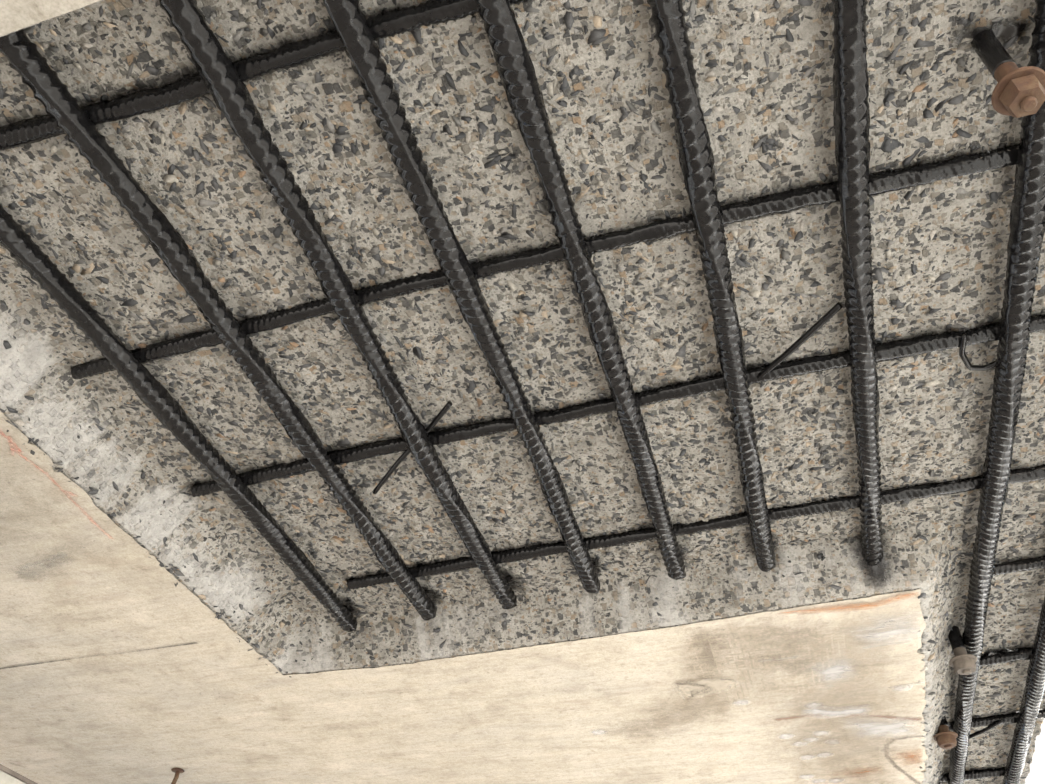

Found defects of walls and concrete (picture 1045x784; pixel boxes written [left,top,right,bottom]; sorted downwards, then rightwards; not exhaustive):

spalling [0,0,196,106]
spalling [0,134,211,350]
spalling [96,95,327,321]
spalling [243,51,441,289]
spalling [375,13,559,264]
spalling [511,0,692,238]
spalling [682,0,838,206]
spalling [724,202,849,367]
spalling [869,165,1016,343]
spalling [866,0,1036,173]
spalling [0,231,999,784]
spalling [964,479,1045,784]